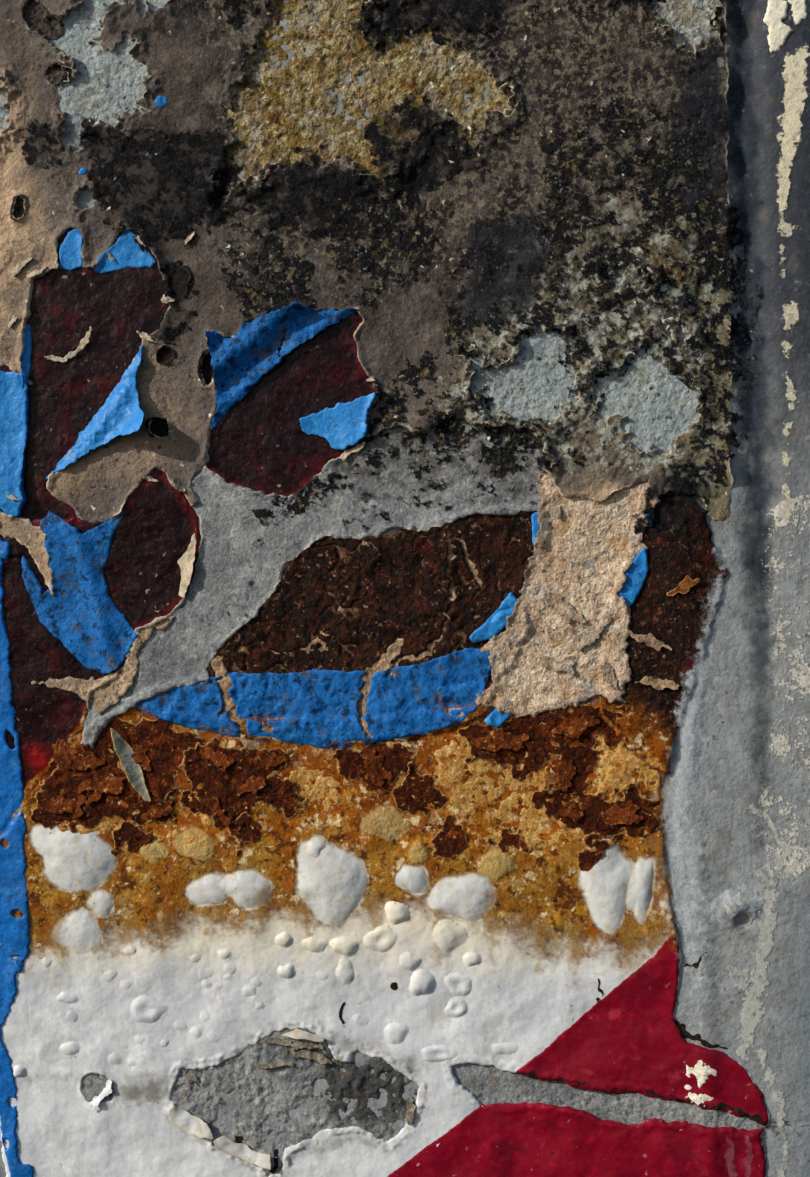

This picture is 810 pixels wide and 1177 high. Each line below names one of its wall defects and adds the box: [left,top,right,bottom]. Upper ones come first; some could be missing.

spalling [22,0,169,153]
spalling [9,194,28,221]
peeling [44,326,93,363]
spalling [197,349,214,386]
water stain [79,0,810,779]
peeling [177,528,197,598]
peeling [208,505,561,679]
water stain [663,547,730,952]
corrosion [12,695,677,963]
water stain [724,778,810,1177]
water stain [113,1081,159,1101]
spalling [169,1028,418,1176]